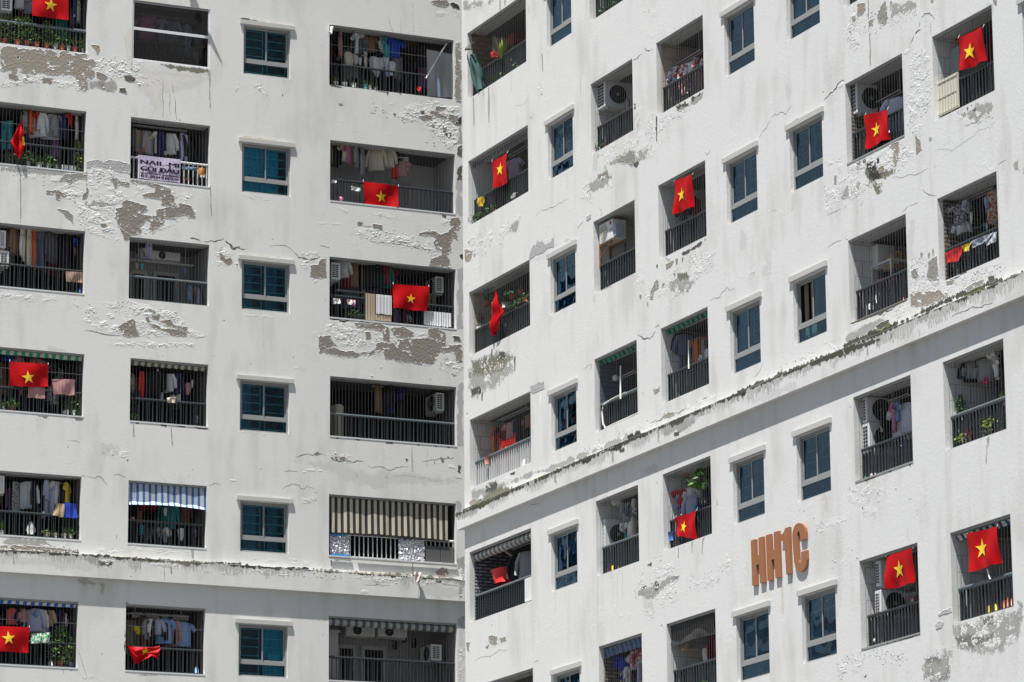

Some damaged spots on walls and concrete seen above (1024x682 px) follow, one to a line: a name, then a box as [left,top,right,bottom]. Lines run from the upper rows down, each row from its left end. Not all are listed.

spalling [0,44,164,95]
peeling [370,41,462,156]
peeling [824,43,933,206]
spalling [13,160,200,243]
crack [191,237,245,250]
peeling [317,207,521,267]
peeling [0,292,206,356]
spalling [314,320,514,398]
damp [456,268,1024,521]
crack [284,454,461,493]
damp [0,537,351,595]
peeling [922,601,1022,682]